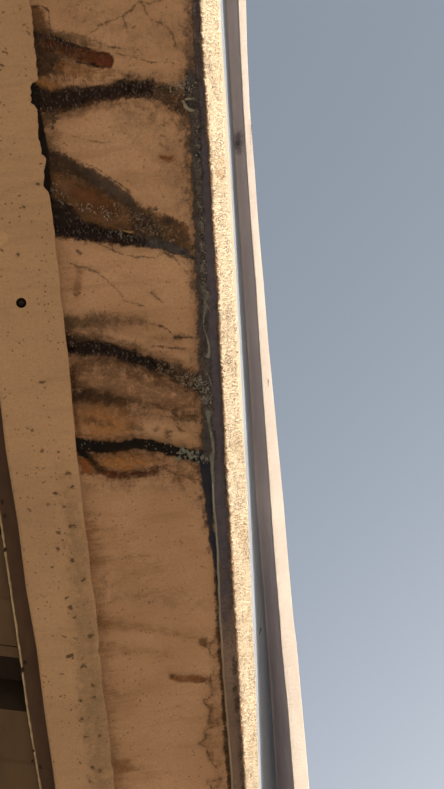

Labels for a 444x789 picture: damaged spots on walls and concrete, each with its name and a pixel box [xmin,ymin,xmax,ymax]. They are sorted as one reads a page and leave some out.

corrosion [33,29,116,89]
leakage [30,0,232,623]
corrosion [170,674,210,683]